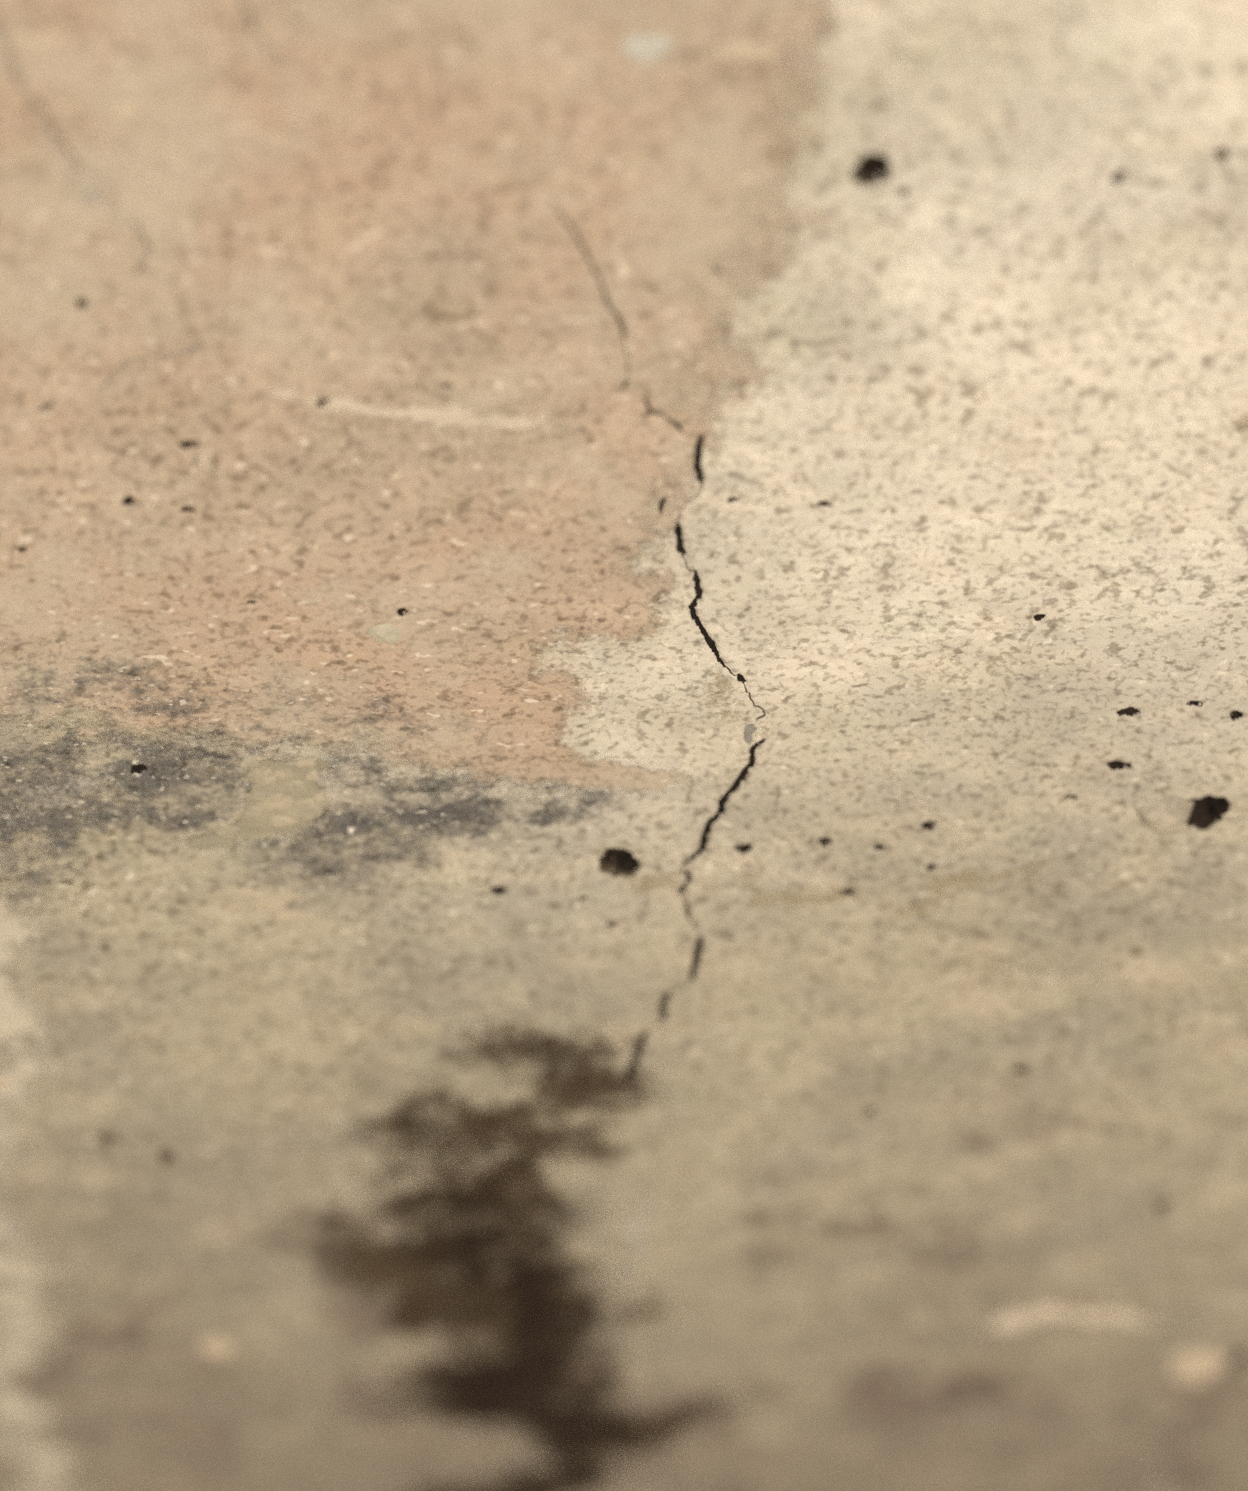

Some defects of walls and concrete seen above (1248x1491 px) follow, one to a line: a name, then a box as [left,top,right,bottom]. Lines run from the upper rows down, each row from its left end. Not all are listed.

crack [553,200,766,1080]
water stain [317,1025,742,1491]